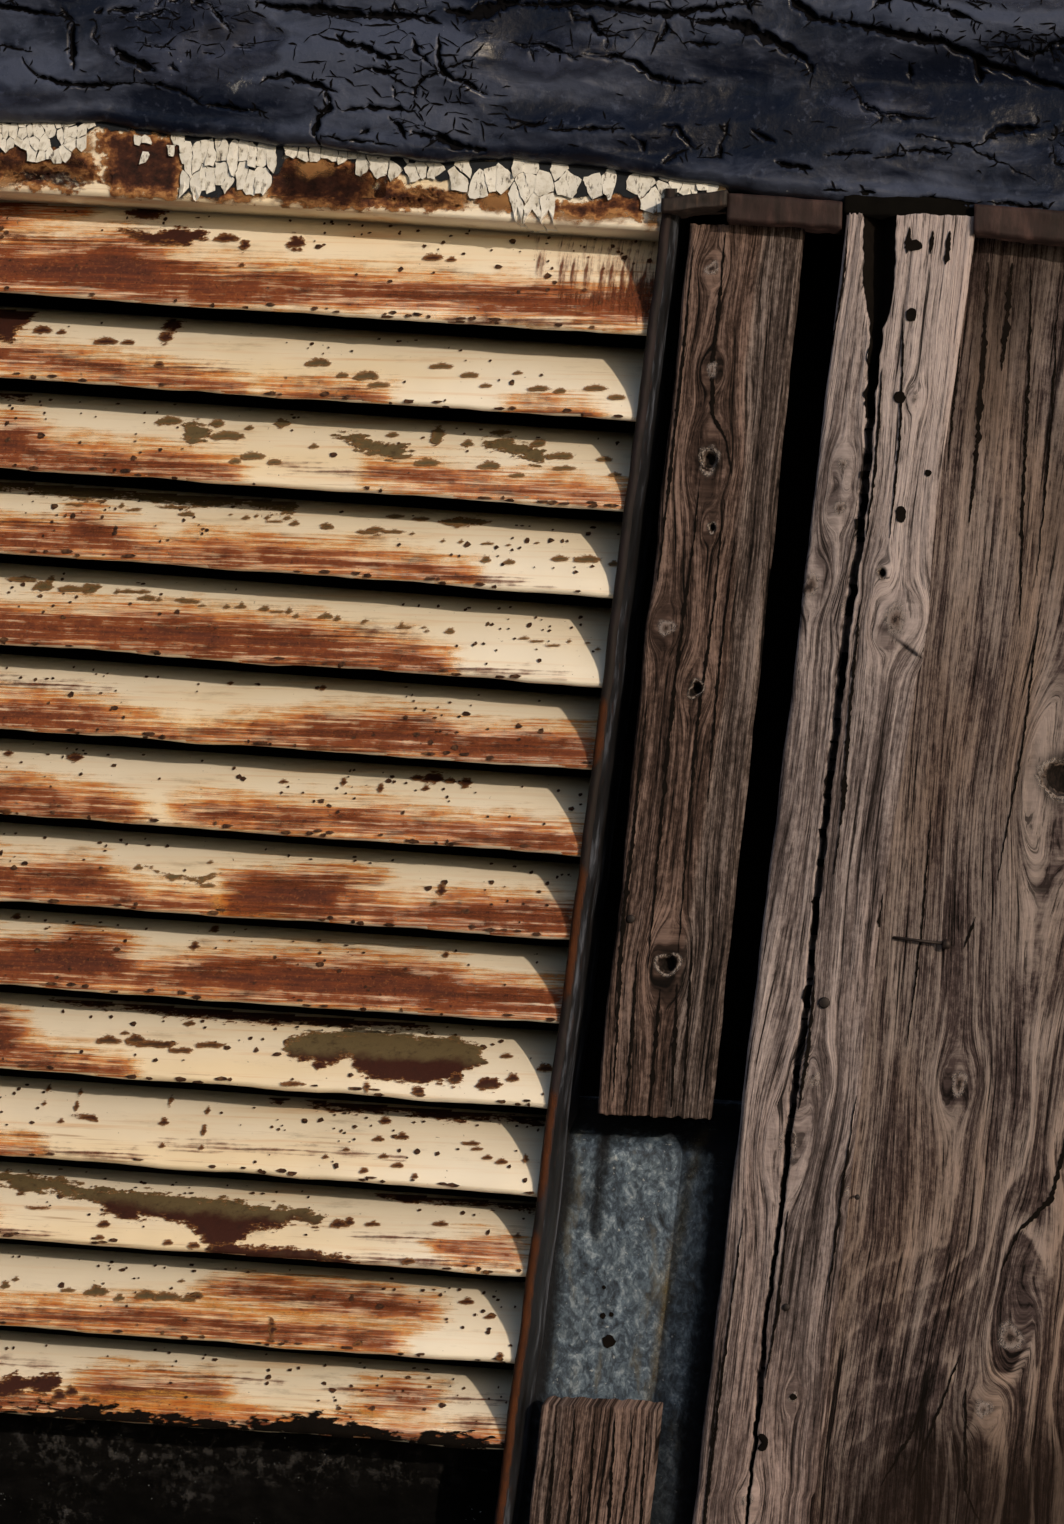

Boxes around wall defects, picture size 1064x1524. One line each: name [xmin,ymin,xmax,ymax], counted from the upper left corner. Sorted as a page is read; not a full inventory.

peeling [0,123,96,164]
corrosion [0,128,662,332]
peeling [116,135,719,266]
peeling [309,425,576,478]
crack [0,0,1064,873]
corrosion [0,592,530,675]
corrosion [0,675,606,768]
corrosion [0,788,586,1024]
peeling [0,1169,380,1263]
peeling [48,997,546,1226]
crack [746,897,820,1524]
corrosion [0,1235,539,1524]